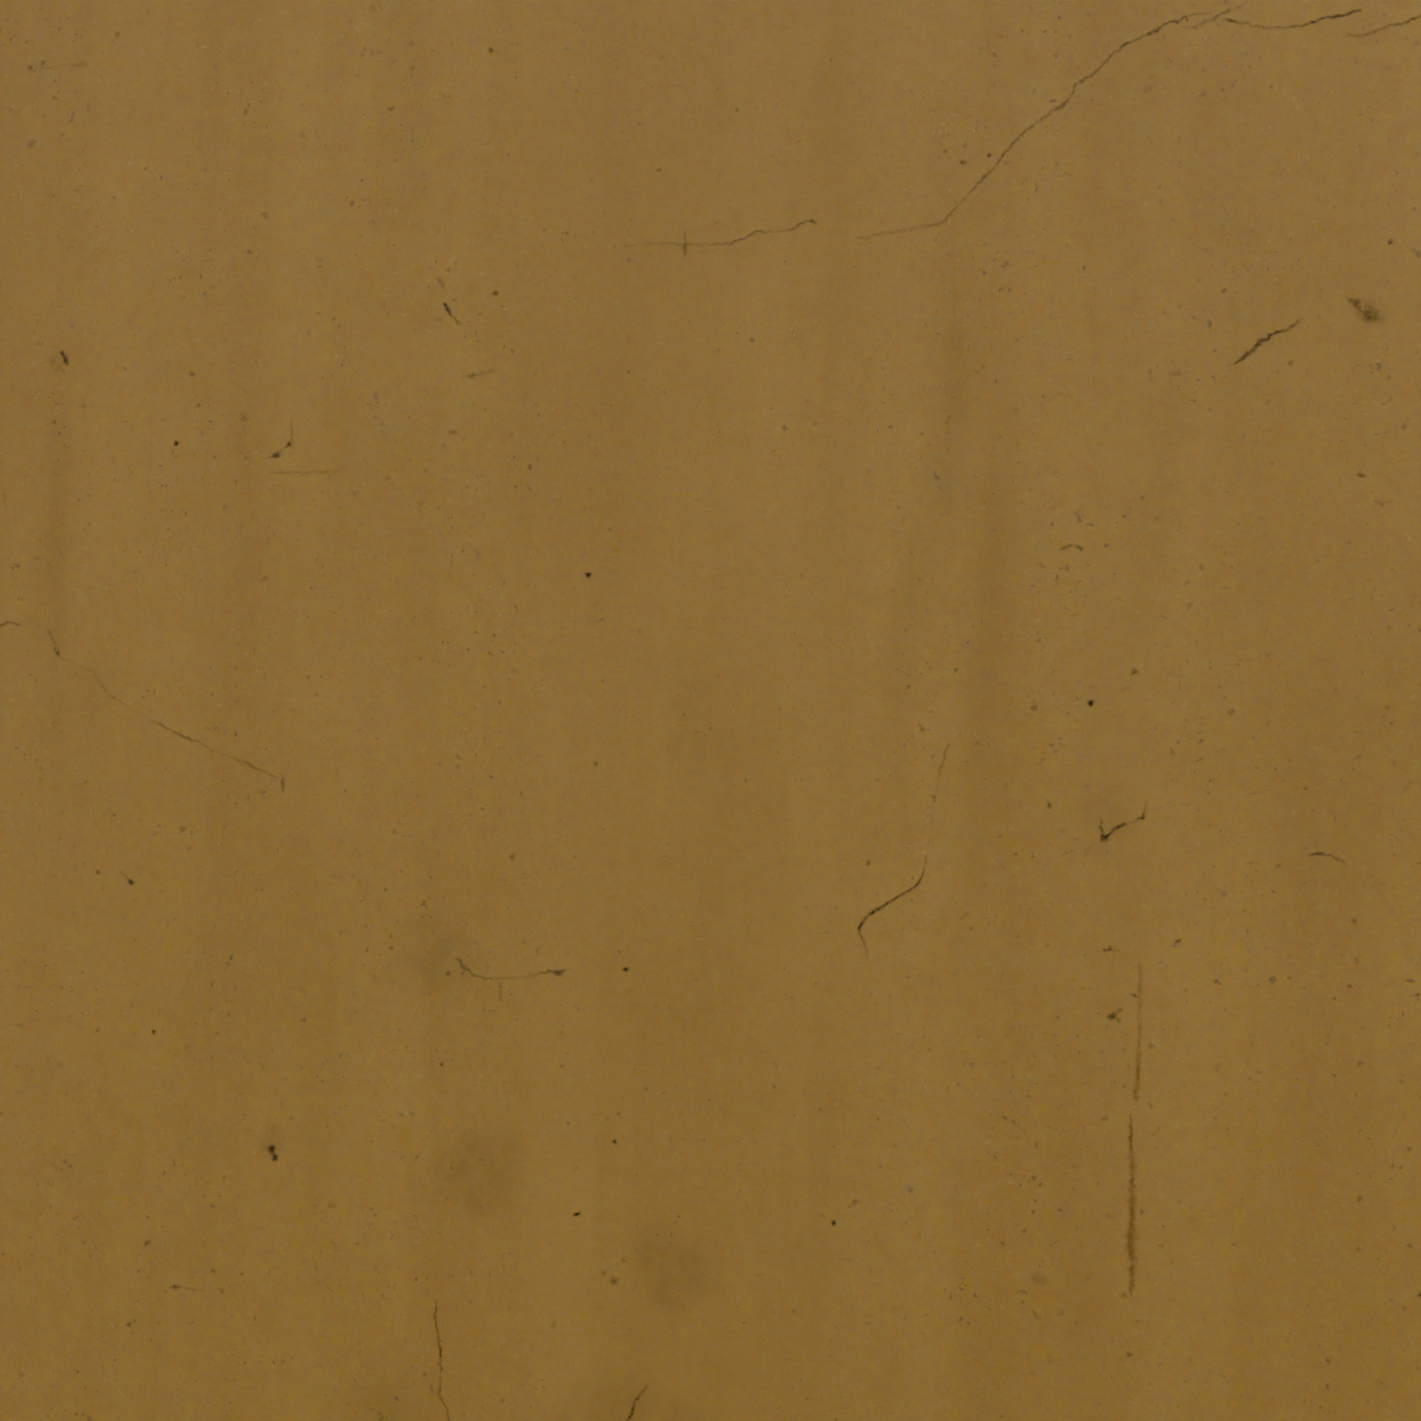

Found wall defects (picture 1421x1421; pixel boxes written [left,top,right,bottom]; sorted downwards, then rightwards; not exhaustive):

crack [855,2,1421,248]
crack [1231,315,1305,368]
crack [852,852,935,961]